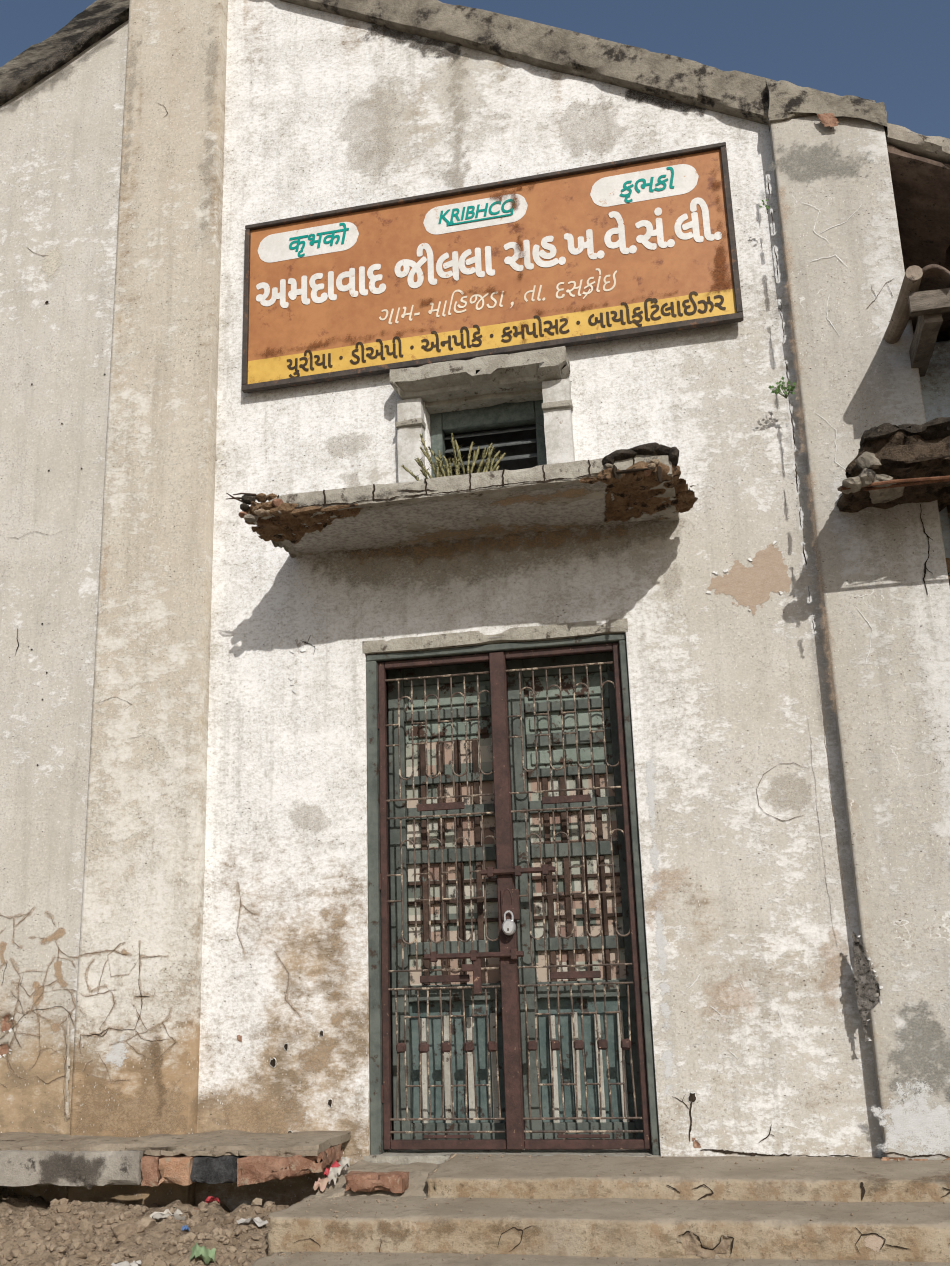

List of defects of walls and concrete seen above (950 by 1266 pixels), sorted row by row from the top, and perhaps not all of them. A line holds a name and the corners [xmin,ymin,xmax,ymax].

water stain [365,22,468,188]
water stain [625,89,706,117]
spalling [226,493,370,544]
spalling [579,442,698,523]
spalling [837,442,950,504]
crack [920,504,933,595]
crack [0,908,175,1120]
water stain [300,991,343,1087]
spalling [852,932,883,1042]
water stain [871,1003,950,1156]
crack [667,1094,950,1252]
crack [679,1231,734,1256]